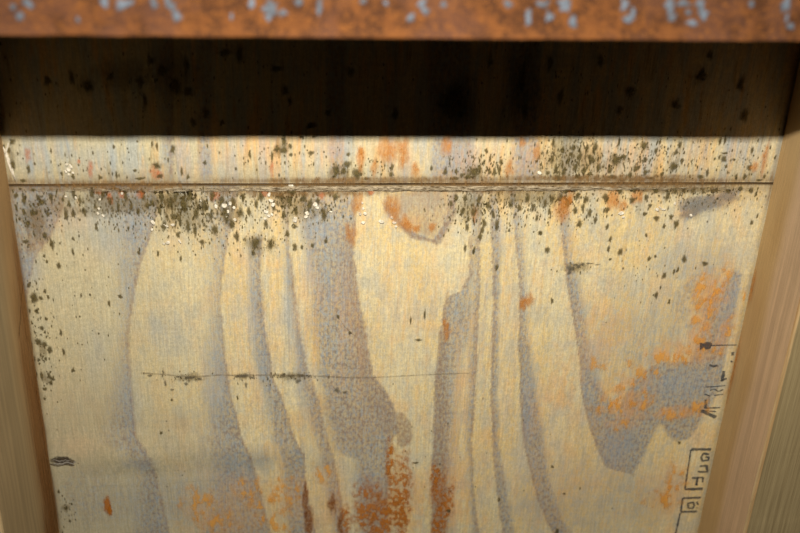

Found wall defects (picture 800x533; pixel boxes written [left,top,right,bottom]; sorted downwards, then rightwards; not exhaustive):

water stain [411,125,776,260]
water stain [3,110,400,533]
corrosion [693,273,731,356]
corrosion [328,446,411,533]
corrosion [431,465,453,533]